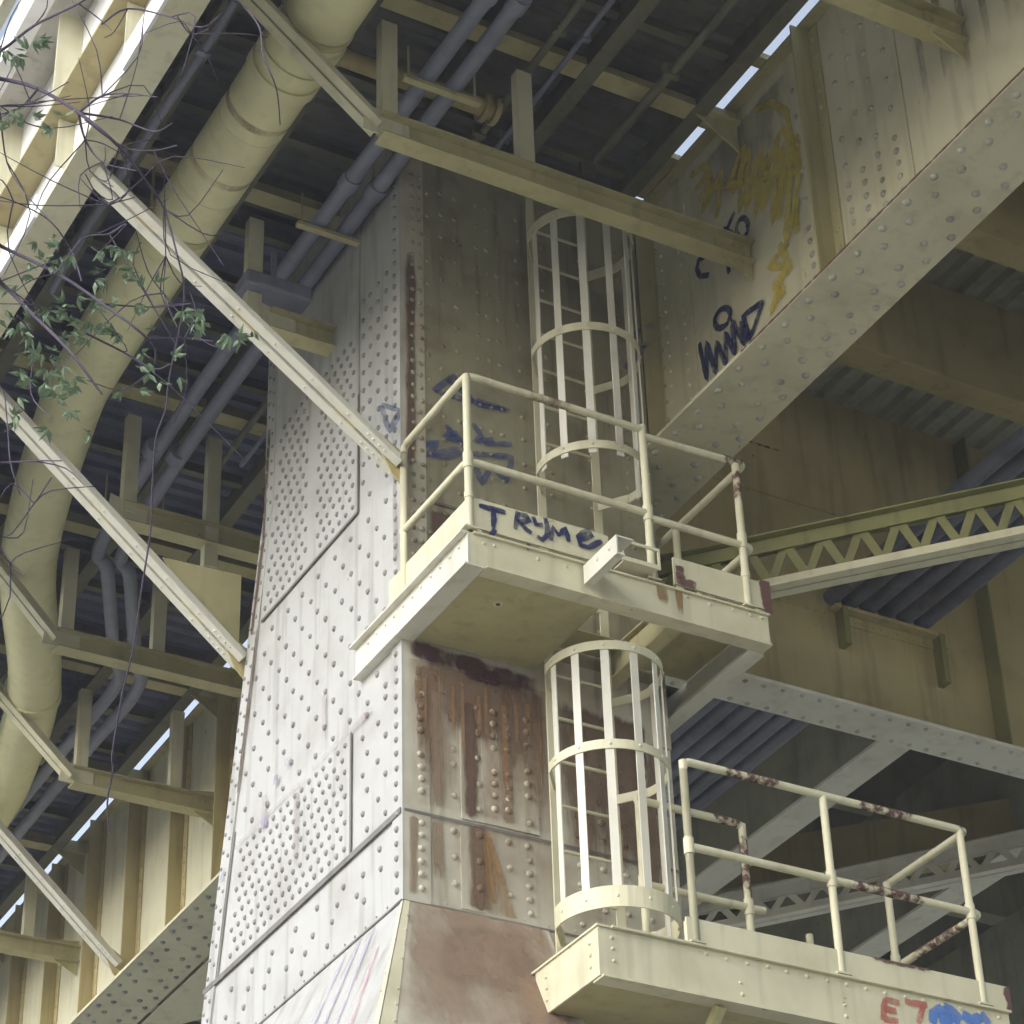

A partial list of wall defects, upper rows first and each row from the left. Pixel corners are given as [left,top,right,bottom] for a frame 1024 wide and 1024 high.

rust [406,257,416,464]
rust [431,511,451,534]
rust [657,565,696,609]
rust [411,665,570,1024]
rust [849,879,923,904]
rust [871,919,968,971]
rust [1003,986,1013,1012]